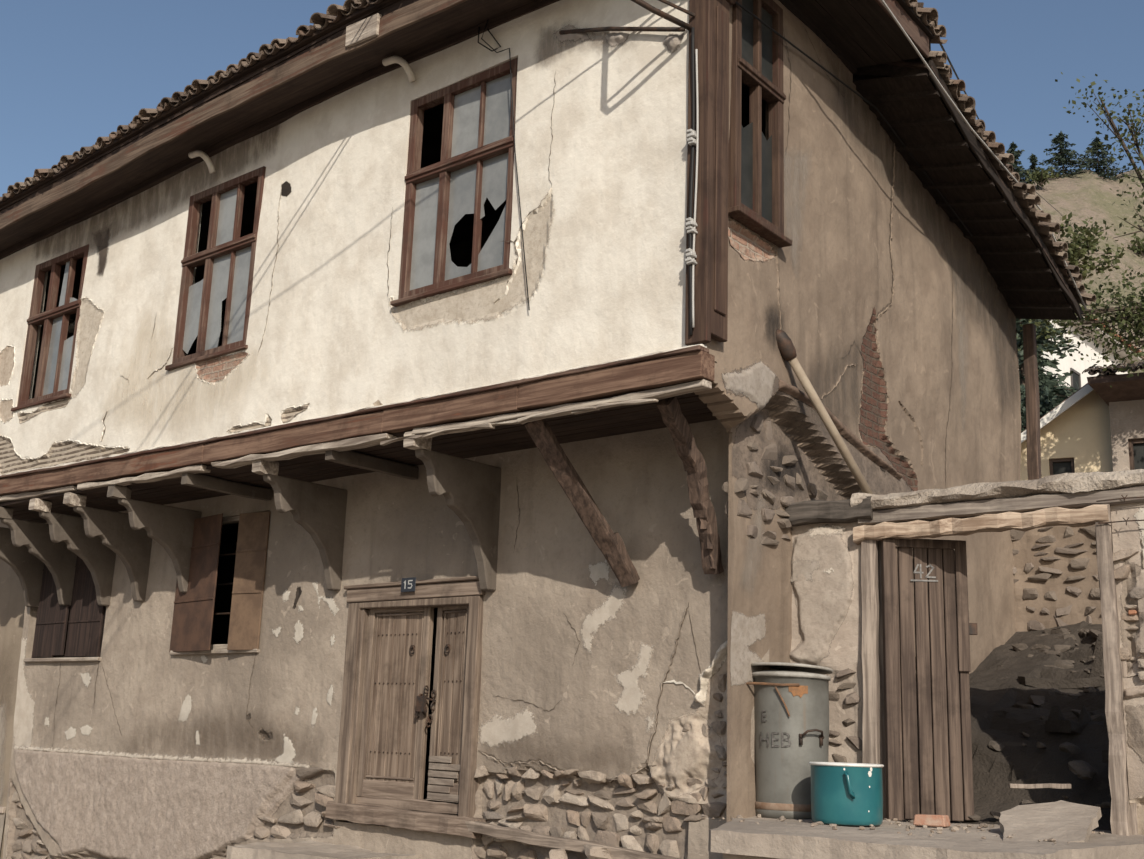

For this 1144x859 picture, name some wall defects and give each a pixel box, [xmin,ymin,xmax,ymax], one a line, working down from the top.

crack [257,181,283,355]
spalling [389,192,554,331]
crack [493,71,556,303]
crack [876,142,895,319]
spalling [0,297,130,475]
spalling [195,352,250,385]
flaking render [721,307,918,546]
crack [478,602,701,785]
peeling [580,560,628,653]
spalling [471,611,766,859]
flaking render [1113,508,1144,681]